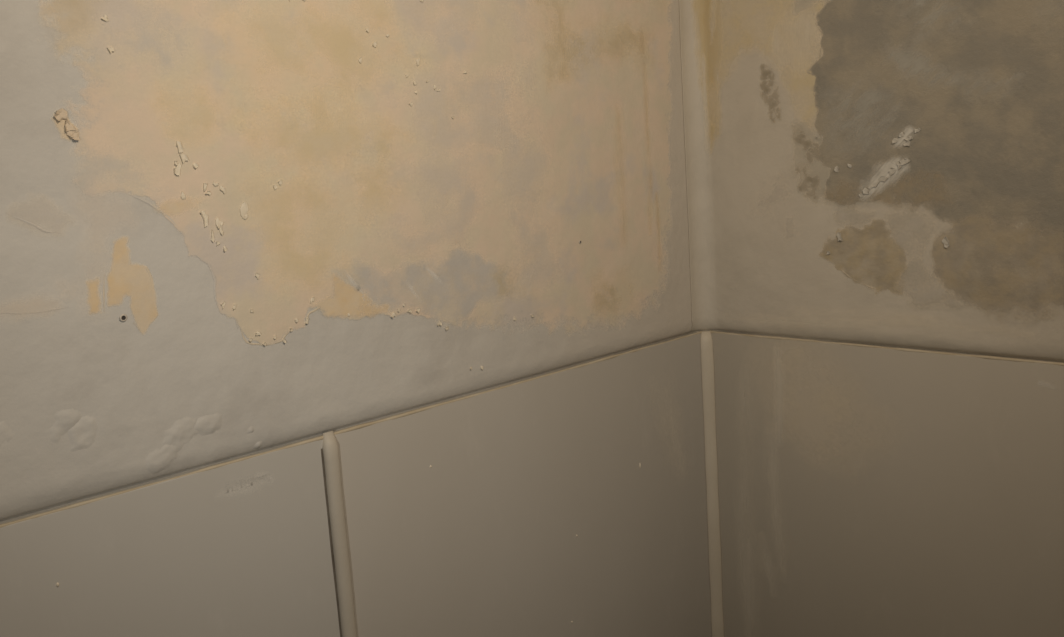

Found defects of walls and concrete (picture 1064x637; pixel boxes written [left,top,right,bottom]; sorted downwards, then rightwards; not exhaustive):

peeling [53,108,80,140]
peeling [87,237,158,334]